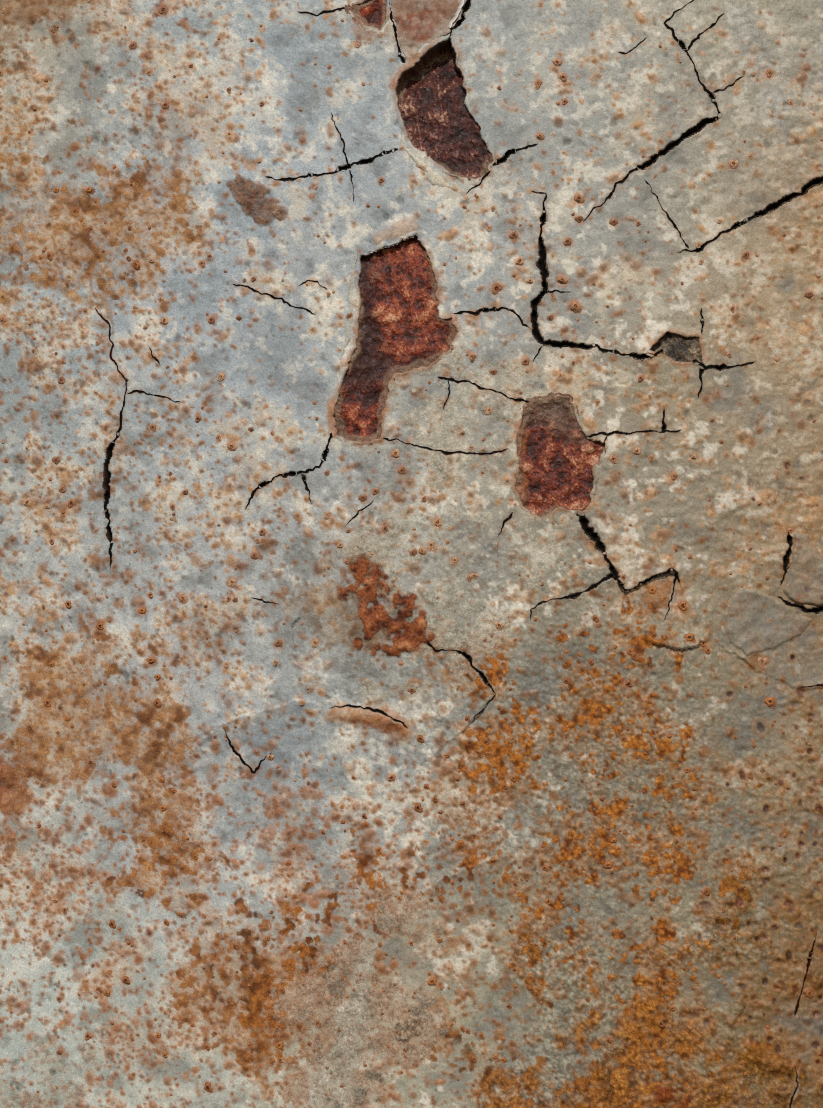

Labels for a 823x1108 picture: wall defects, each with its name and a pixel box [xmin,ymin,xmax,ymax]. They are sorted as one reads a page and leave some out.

spalling [342,0,497,191]
crack [584,0,823,253]
corrosion [0,156,203,322]
spalling [329,230,462,448]
crack [453,191,663,361]
crack [95,308,180,566]
crack [245,433,333,509]
corrosion [330,529,442,657]
spalling [511,392,609,522]
crack [530,510,680,622]
corrosion [0,635,230,932]
corrosion [169,582,805,1108]